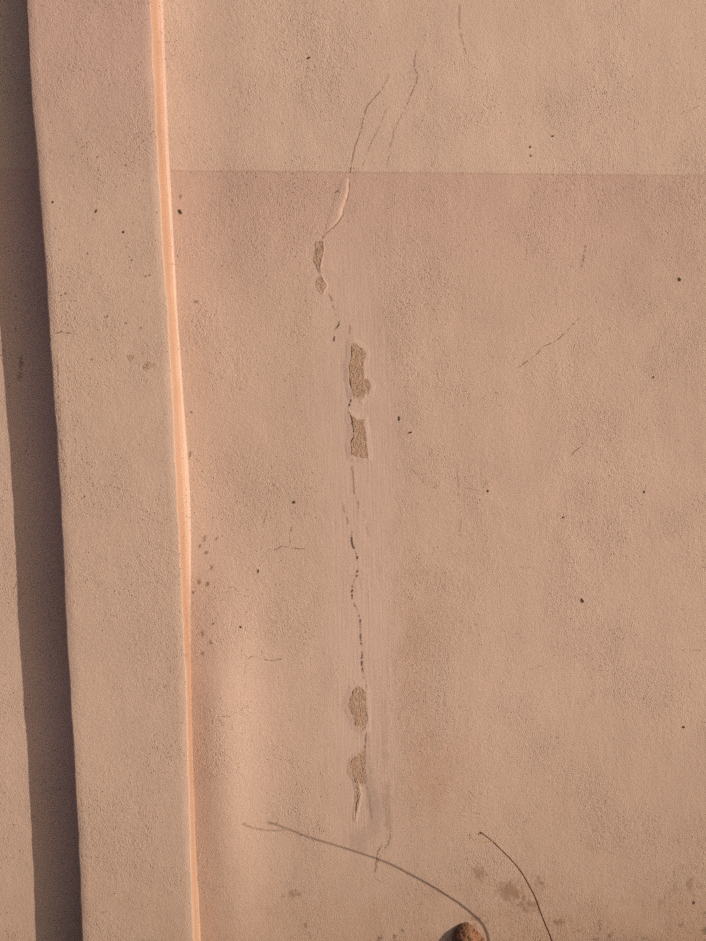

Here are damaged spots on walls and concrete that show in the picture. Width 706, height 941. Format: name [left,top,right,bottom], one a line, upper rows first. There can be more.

crack [314,74,389,272]
peeling [313,240,328,295]
peeling [343,337,377,464]
peeling [343,680,372,823]